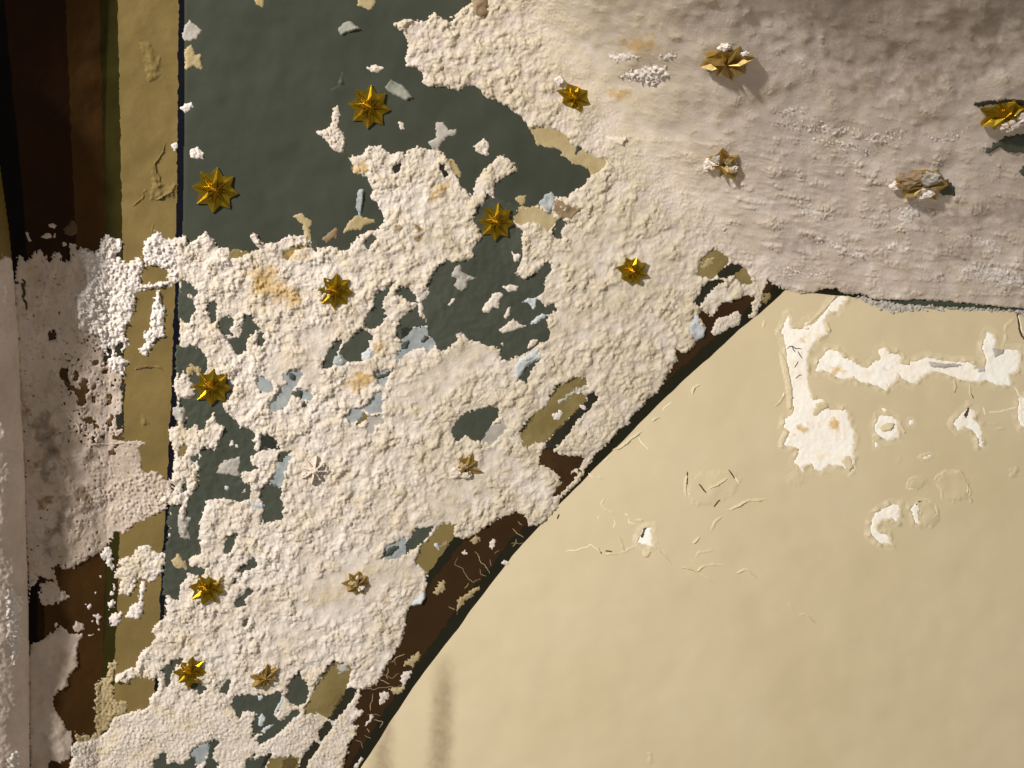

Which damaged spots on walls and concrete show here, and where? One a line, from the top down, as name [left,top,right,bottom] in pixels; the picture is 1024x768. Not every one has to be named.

peeling [182,20,202,70]
peeling [338,21,360,35]
peeling [357,0,376,10]
peeling [385,80,413,101]
spalling [316,105,345,153]
spalling [774,295,1024,484]
spalling [13,122,771,768]
spalling [863,496,924,551]